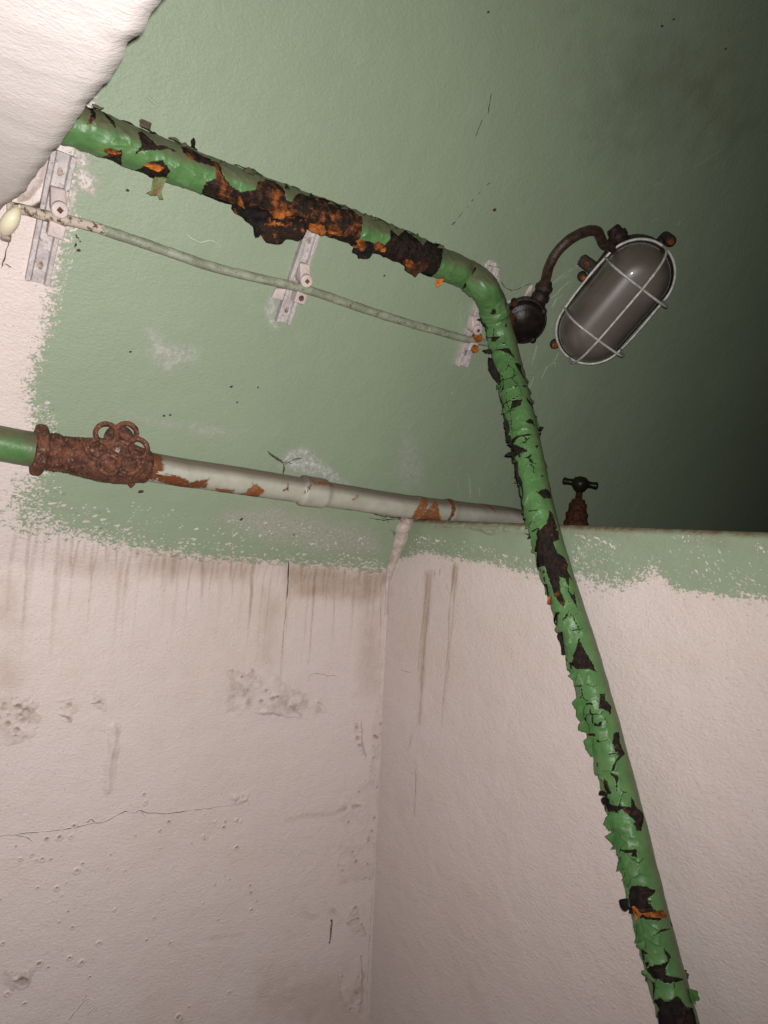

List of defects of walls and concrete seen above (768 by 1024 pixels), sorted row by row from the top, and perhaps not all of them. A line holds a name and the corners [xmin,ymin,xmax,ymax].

crack [0,805,232,843]